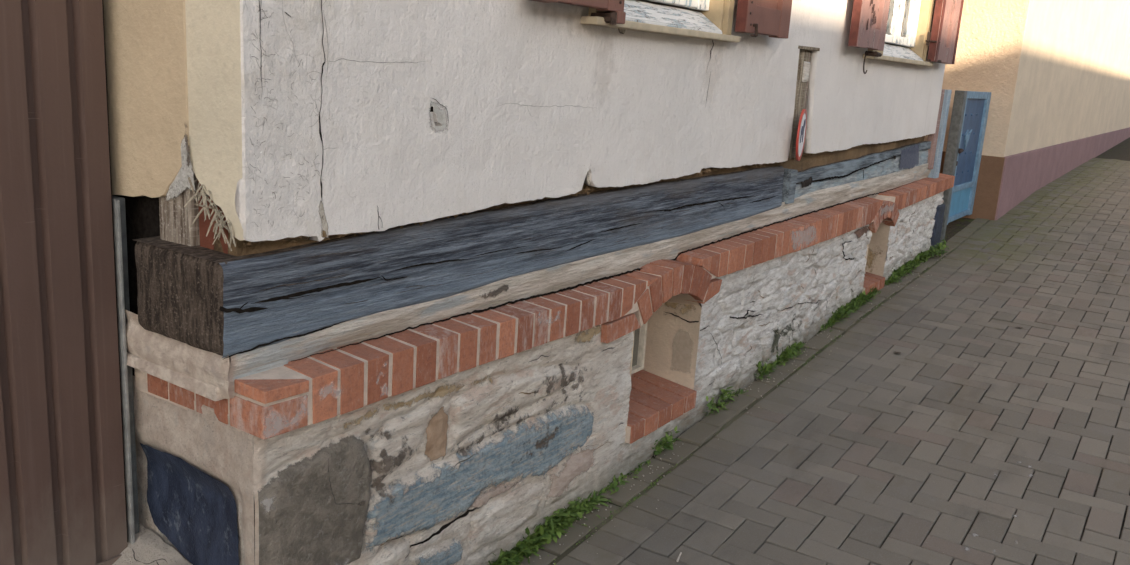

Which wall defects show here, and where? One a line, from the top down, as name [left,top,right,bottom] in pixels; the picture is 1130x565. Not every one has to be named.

flaking render [430,98,449,131]
flaking render [166,125,376,251]
crack [219,0,936,385]
crack [380,482,554,556]